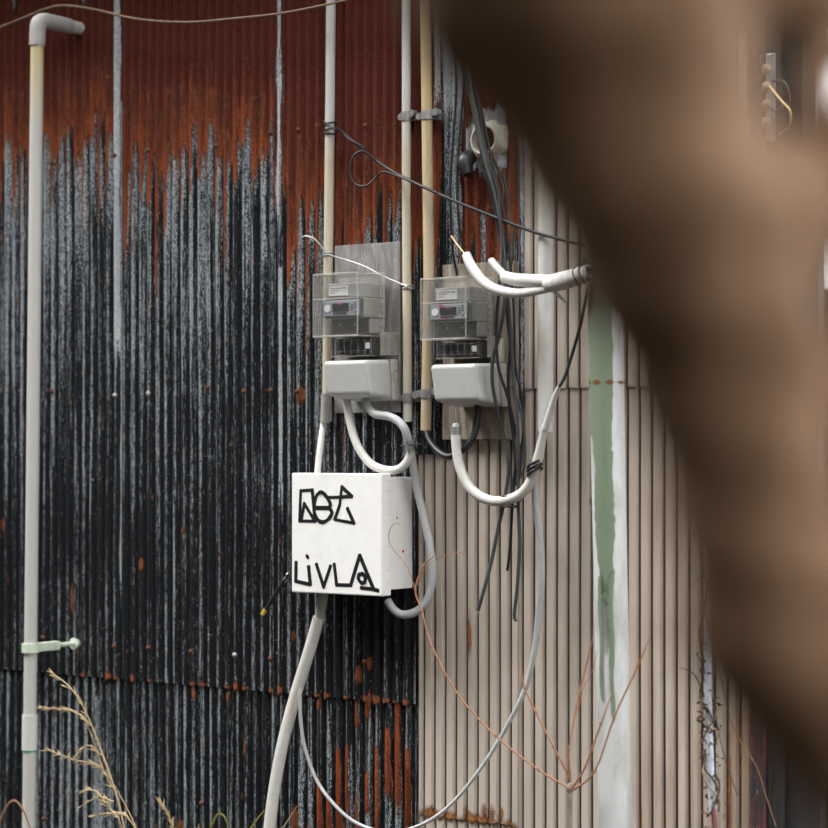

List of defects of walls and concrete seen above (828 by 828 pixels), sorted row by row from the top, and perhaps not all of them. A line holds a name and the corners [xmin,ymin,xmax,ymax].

peeling [6,134,19,269]
peeling [44,0,284,588]
rust [0,0,423,359]
peeling [278,193,334,510]
peeling [387,181,401,242]
rust [432,67,442,280]
rust [452,95,519,264]
rust [291,656,516,828]